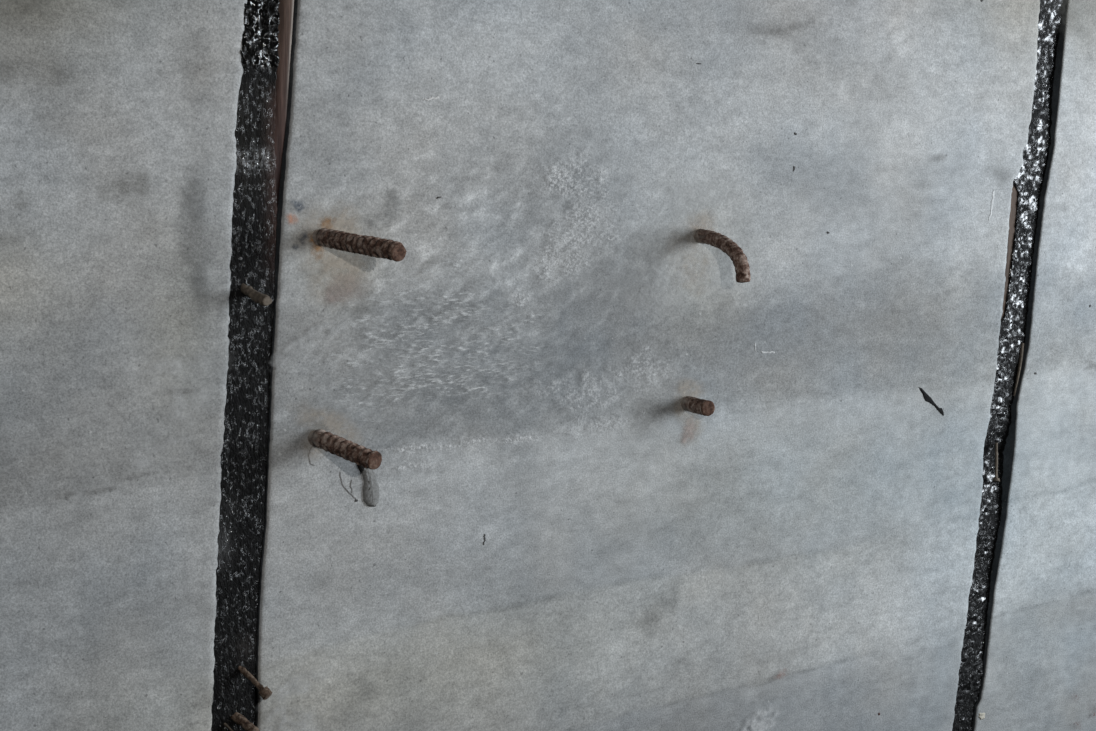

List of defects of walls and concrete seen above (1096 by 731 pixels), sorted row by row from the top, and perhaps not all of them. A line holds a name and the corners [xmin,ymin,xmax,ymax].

rust [311,215,363,287]